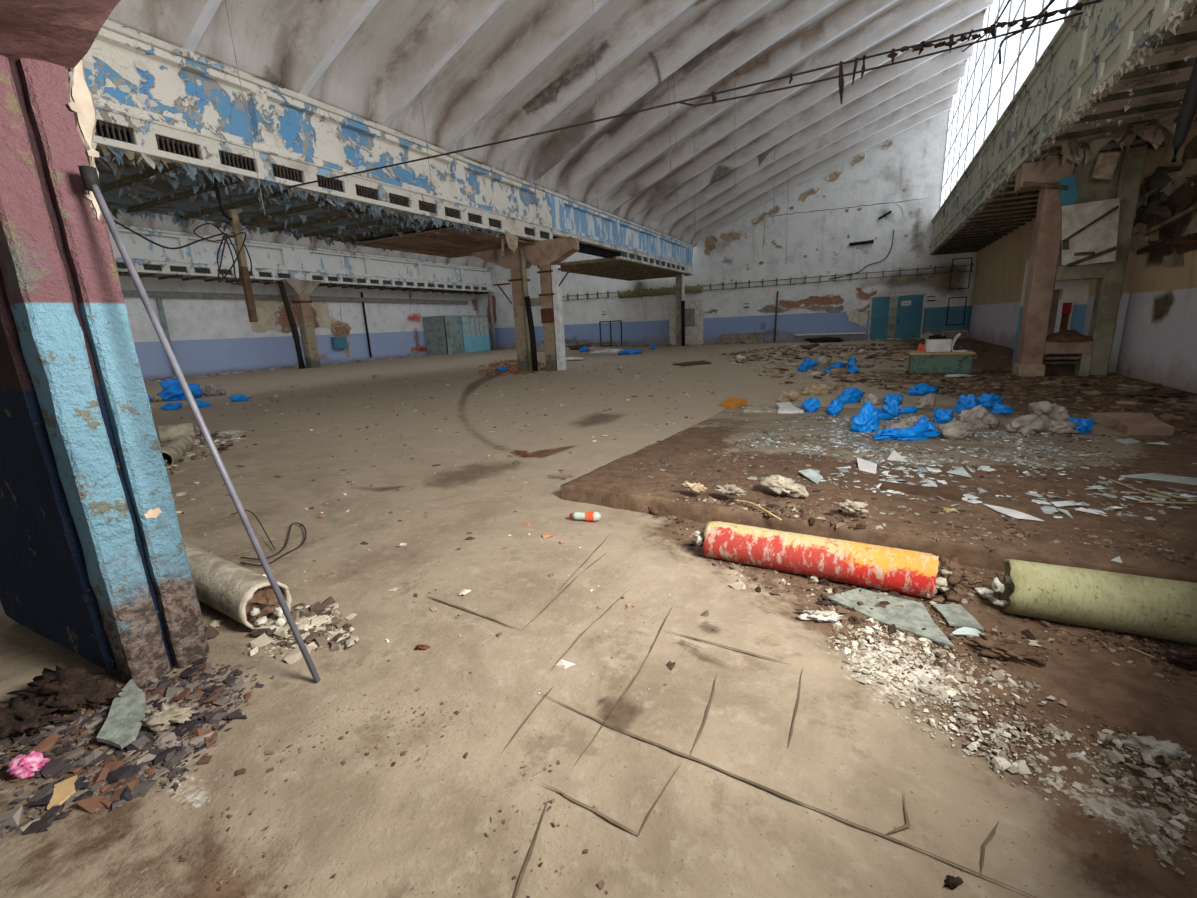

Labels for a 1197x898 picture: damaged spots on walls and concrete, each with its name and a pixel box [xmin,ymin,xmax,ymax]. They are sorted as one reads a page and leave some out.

peeling [67,58,500,252]
water stain [523,42,608,113]
water stain [537,23,753,178]
water stain [704,166,739,189]
water stain [709,36,794,92]
peeling [947,0,1197,267]
spalling [757,248,877,327]
spalling [251,300,351,358]
spalling [142,506,163,519]